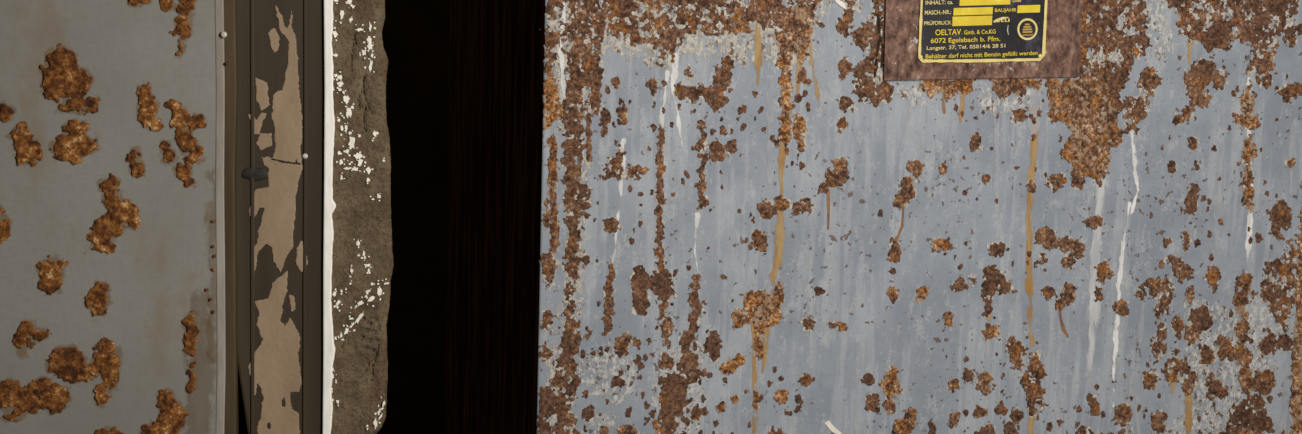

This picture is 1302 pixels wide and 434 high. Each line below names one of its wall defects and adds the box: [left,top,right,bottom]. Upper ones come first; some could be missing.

corrosion [128,0,196,56]
corrosion [0,43,101,167]
corrosion [137,82,207,187]
corrosion [0,208,11,244]
corrosion [37,255,69,295]
corrosion [85,282,109,316]
corrosion [85,150,145,254]
peeling [248,5,308,434]
corrosion [537,0,894,434]
corrosion [0,320,121,422]
corrosion [142,311,201,434]
corrosion [95,426,124,434]